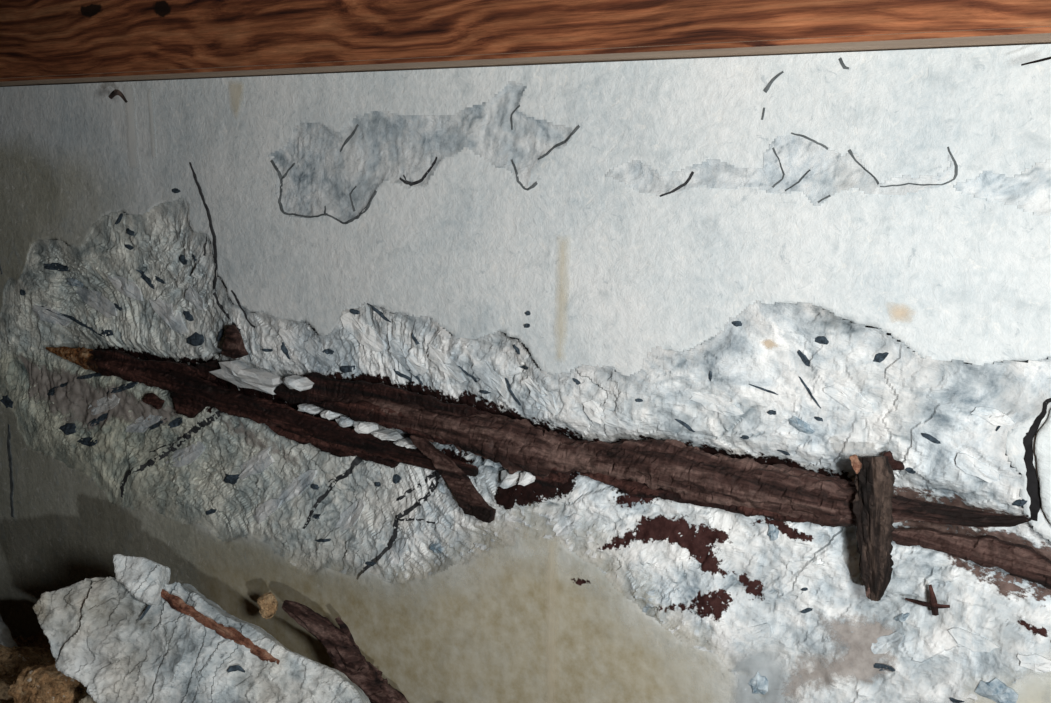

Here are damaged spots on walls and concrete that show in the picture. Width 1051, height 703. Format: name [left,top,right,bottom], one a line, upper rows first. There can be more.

peeling [268,81,573,222]
crack [772,133,958,191]
crack [189,162,255,332]
crack [303,456,362,529]
crack [356,470,441,580]
rust [327,371,622,442]
spalling [0,188,1051,703]
rust [494,471,584,510]
rust [598,489,765,621]
rust [753,518,813,542]
damp [206,557,706,703]
damp [736,653,784,703]